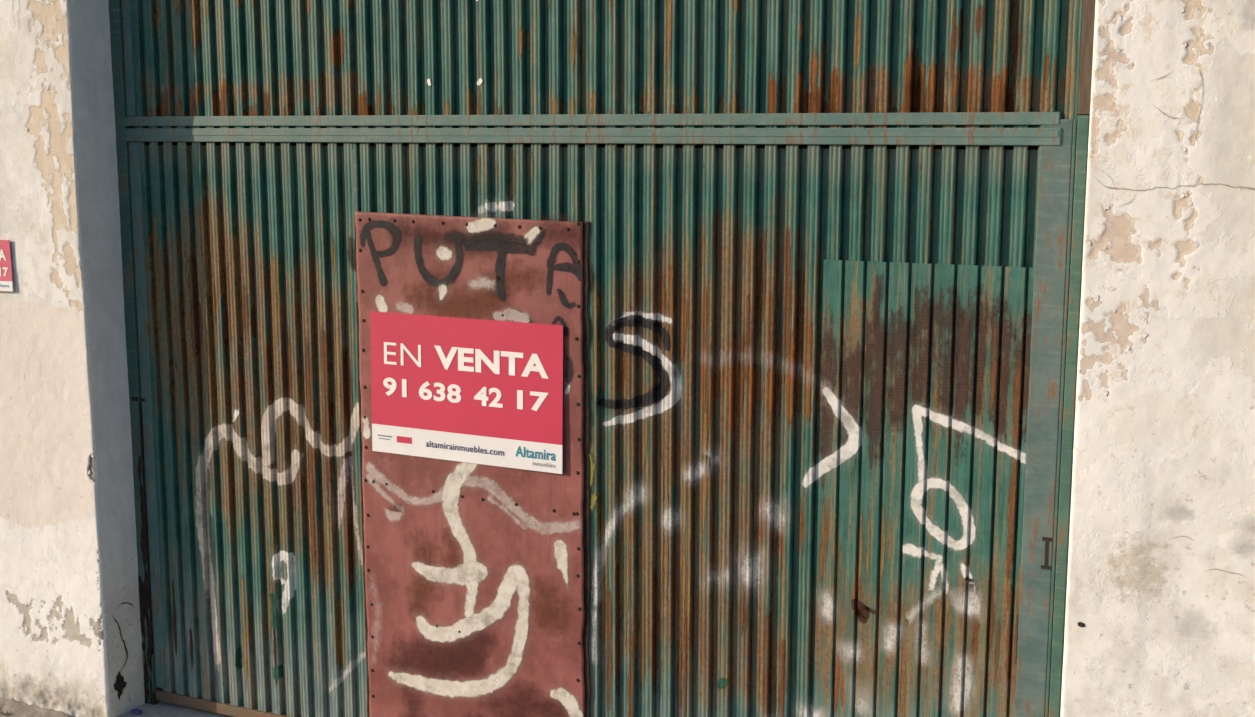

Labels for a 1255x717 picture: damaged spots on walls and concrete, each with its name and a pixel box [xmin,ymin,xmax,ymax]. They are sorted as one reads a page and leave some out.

peeling [25,0,83,311]
rust [212,80,320,116]
rust [767,20,842,113]
rust [875,0,1034,128]
peeling [1090,0,1134,158]
peeling [1174,0,1214,162]
peeling [1085,204,1161,271]
rust [593,281,605,407]
peeling [1078,285,1159,401]
rust [148,178,357,689]
rust [596,230,1032,717]
peeling [4,551,103,652]